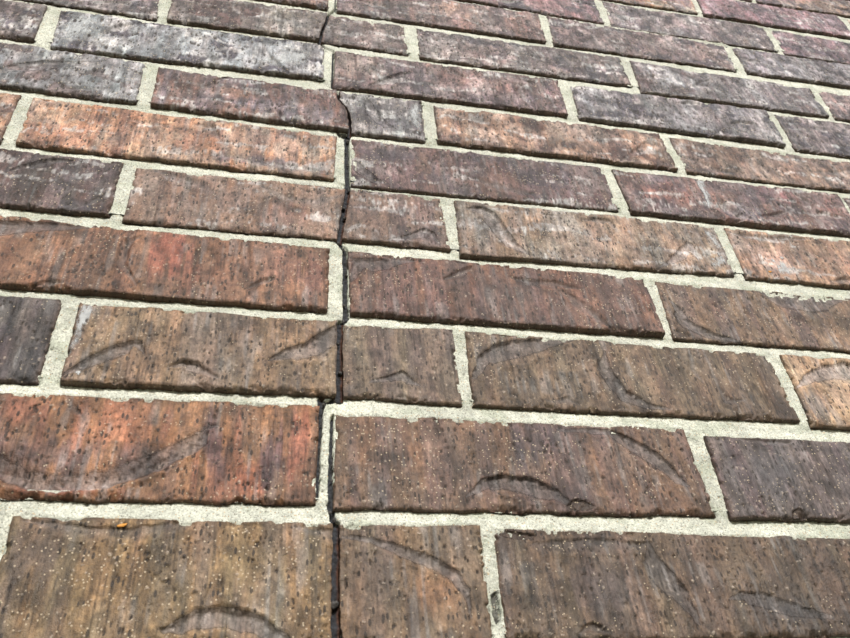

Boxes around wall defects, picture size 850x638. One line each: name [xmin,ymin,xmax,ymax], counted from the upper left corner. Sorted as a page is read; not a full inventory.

crack [316,0,351,638]